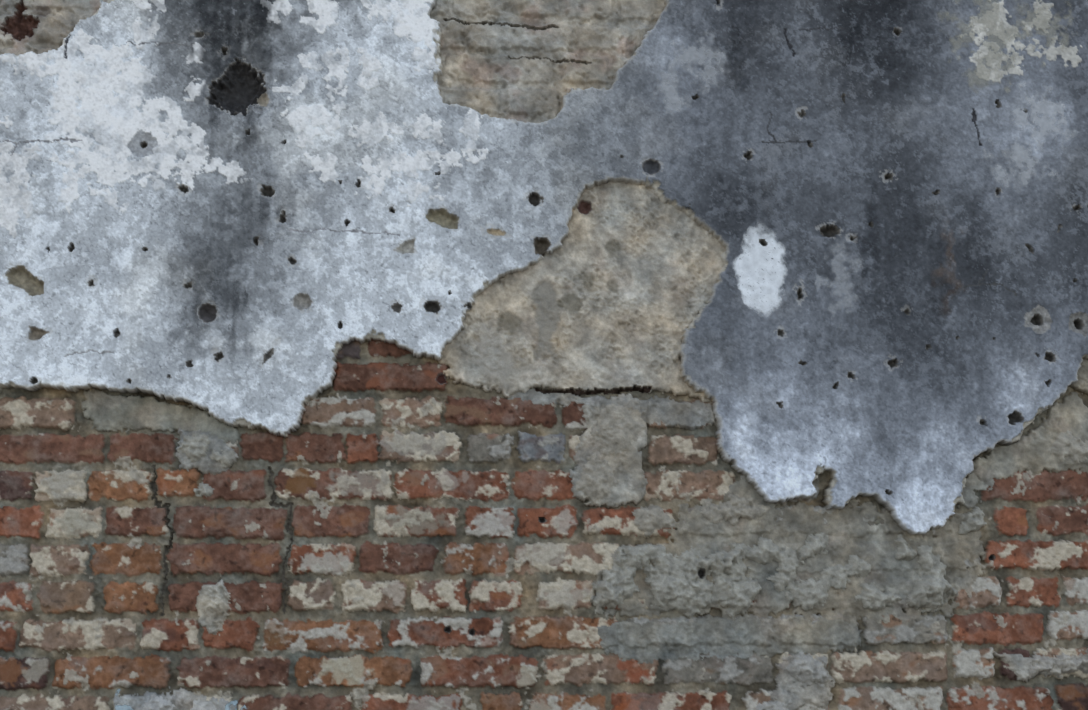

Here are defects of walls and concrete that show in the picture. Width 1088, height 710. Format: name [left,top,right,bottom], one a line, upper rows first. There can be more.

peeling [959,0,1083,84]
crack [0,137,83,157]
peeling [0,0,253,238]
spalling [256,0,665,229]
spalling [438,158,725,404]
efflorescence [734,224,786,315]
peeling [28,325,50,341]